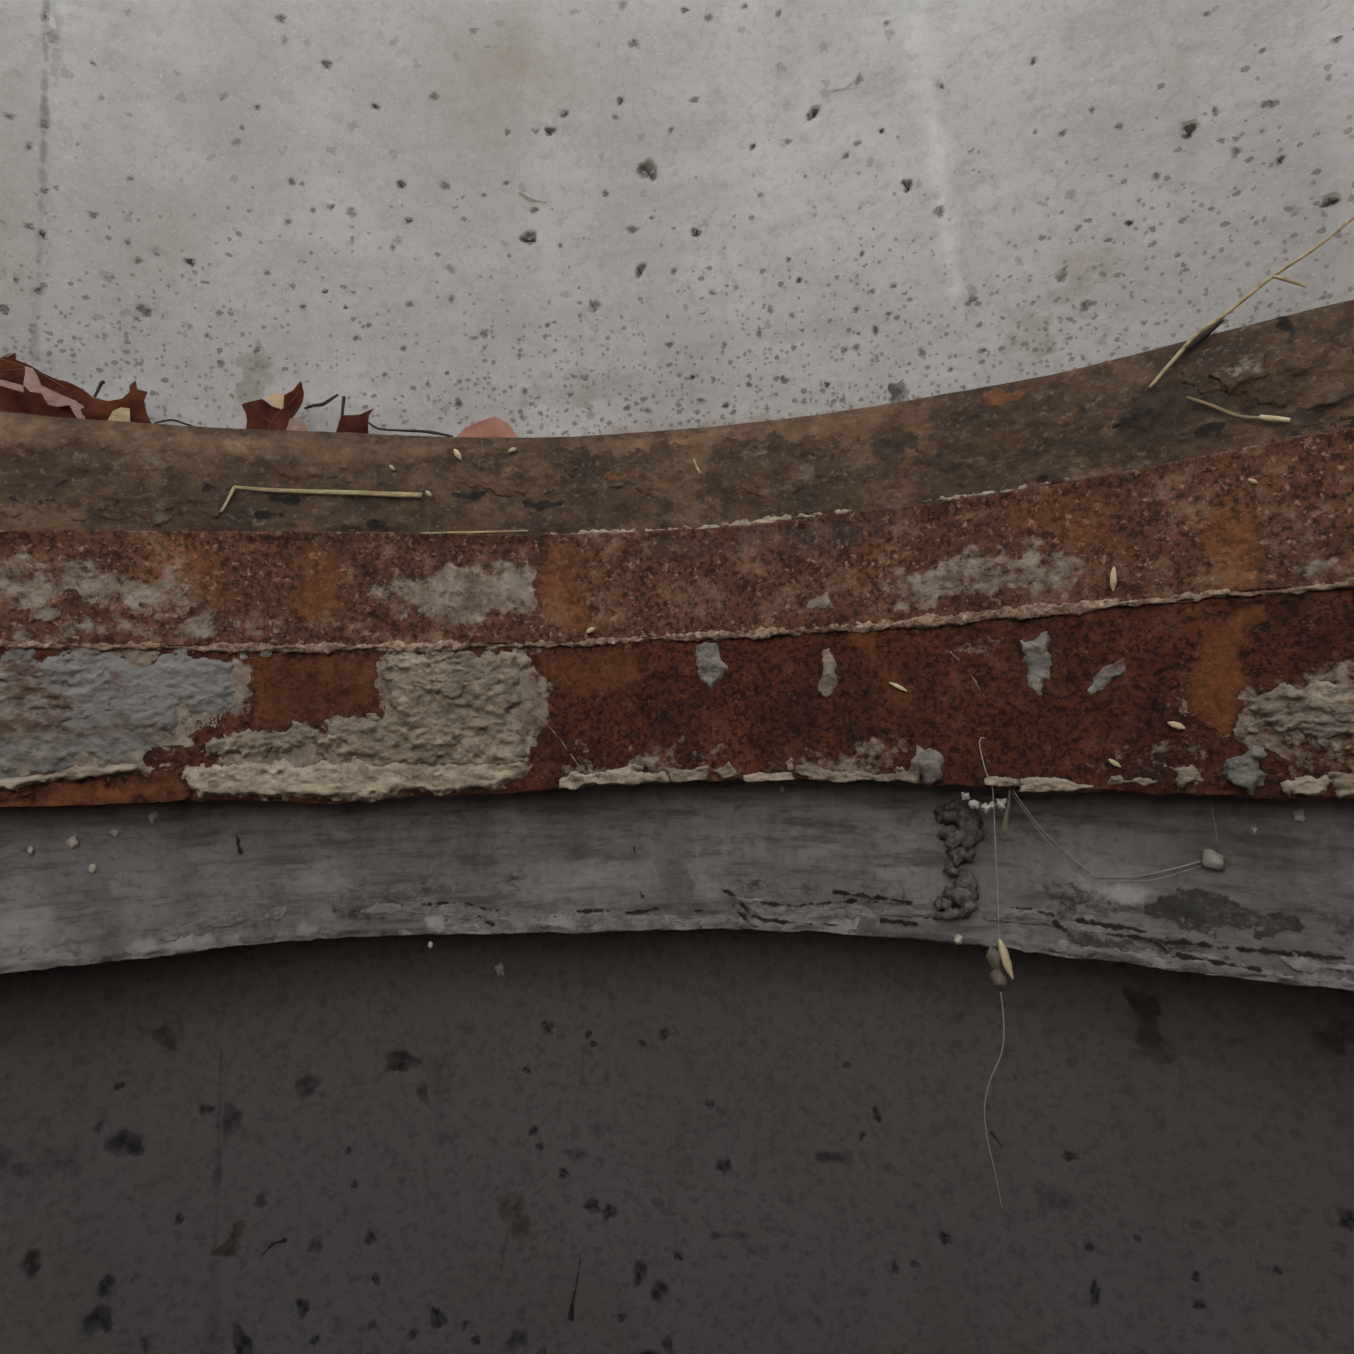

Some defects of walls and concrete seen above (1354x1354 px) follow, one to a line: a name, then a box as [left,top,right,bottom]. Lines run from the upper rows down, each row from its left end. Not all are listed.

rust [559,397,876,437]
rust [982,373,1062,409]
rust [531,534,659,708]
peeling [0,653,120,727]
rust [246,650,386,732]
peeling [393,646,503,700]
rust [841,630,926,727]
peeling [1260,691,1354,754]
peeling [0,763,138,791]
rust [0,761,193,807]
peeling [181,756,533,804]
peeling [978,906,1354,992]